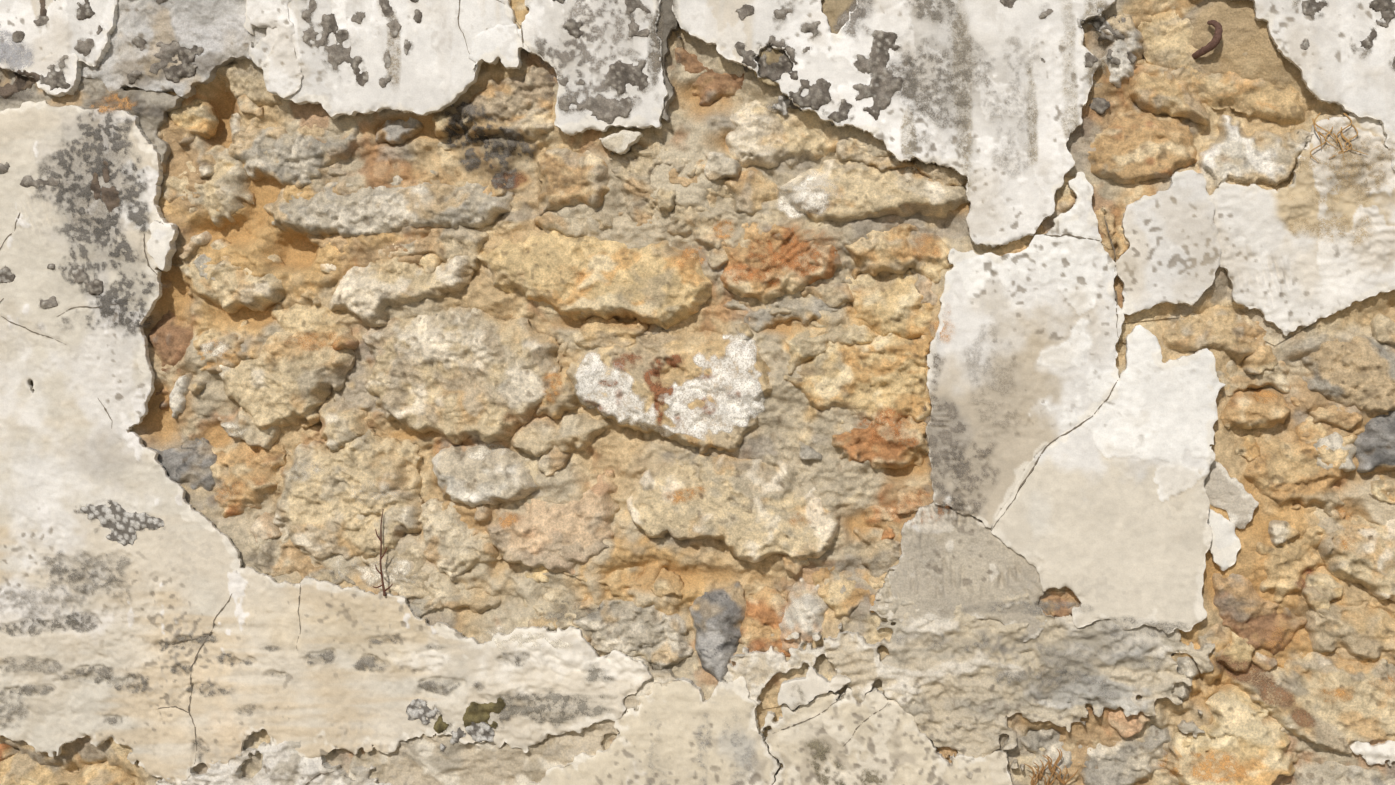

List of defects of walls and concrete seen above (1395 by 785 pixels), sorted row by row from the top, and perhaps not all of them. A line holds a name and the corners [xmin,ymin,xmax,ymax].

spalling [130,0,992,711]
crack [991,380,1118,531]
spalling [925,0,1395,785]
peeling [0,613,96,636]
peeling [45,553,129,593]
crack [156,594,232,764]
spalling [0,658,393,785]
crack [772,695,888,746]